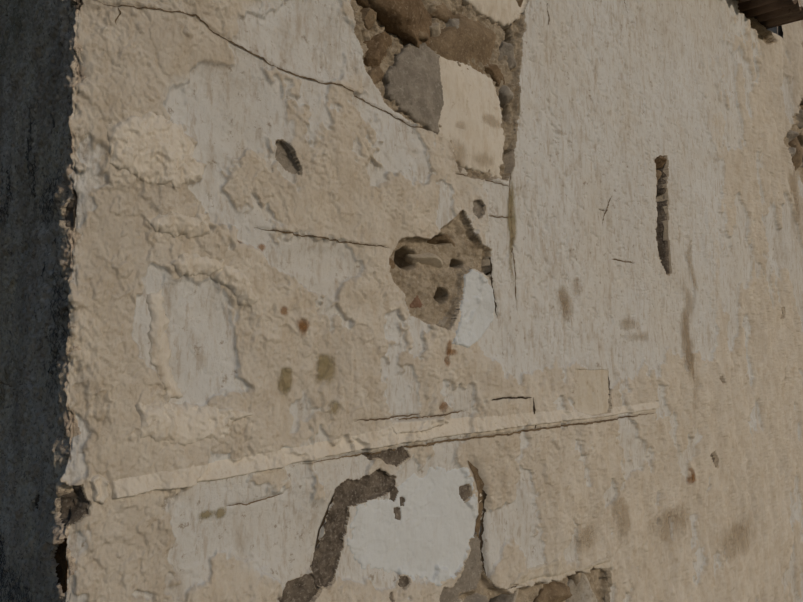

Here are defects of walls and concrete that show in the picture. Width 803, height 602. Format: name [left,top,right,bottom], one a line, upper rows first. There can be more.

crack [97,0,424,129]
spalling [350,0,529,180]
crack [254,227,389,248]
spalling [389,200,495,348]
spalling [654,155,670,275]
crack [303,396,654,464]
spalling [59,474,109,526]
crack [227,493,283,506]
crack [315,495,334,548]
flaking render [278,446,409,602]
crack [468,461,487,574]
spalling [439,532,614,602]